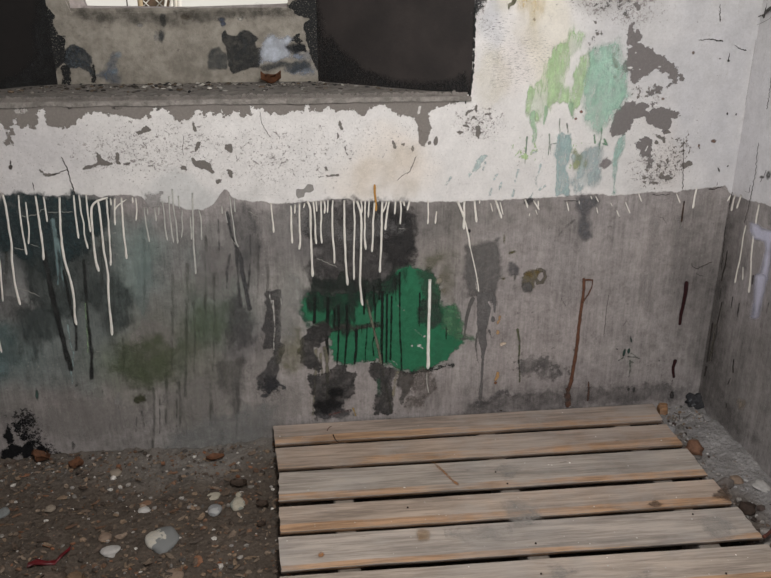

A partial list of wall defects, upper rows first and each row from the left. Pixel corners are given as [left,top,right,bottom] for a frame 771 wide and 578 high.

peeling [0,0,491,184]
peeling [145,191,163,208]